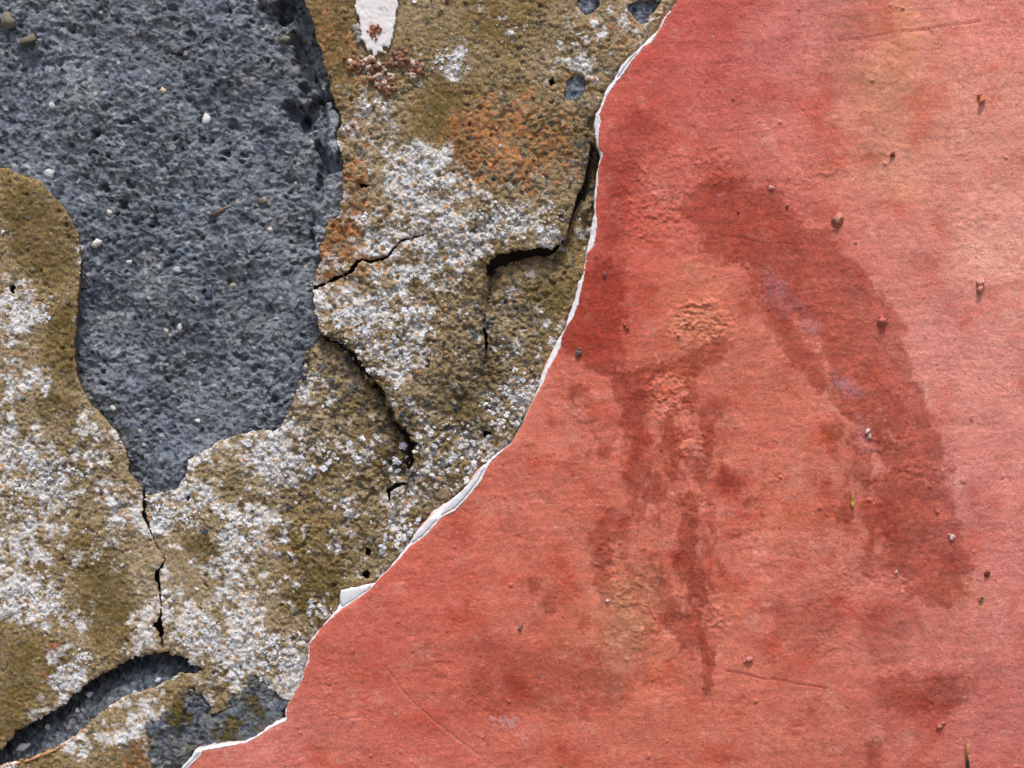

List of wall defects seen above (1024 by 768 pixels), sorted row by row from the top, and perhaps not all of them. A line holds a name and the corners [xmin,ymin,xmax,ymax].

flaking render [342,0,425,97]
spalling [0,0,344,495]
crack [313,233,427,290]
crack [483,153,593,356]
flaking render [522,0,671,425]
crack [142,491,169,653]
crack [324,336,386,397]
crack [386,422,416,500]
flaking render [297,444,510,688]
damp [561,256,751,694]
damp [681,176,974,608]
spalling [0,652,202,767]